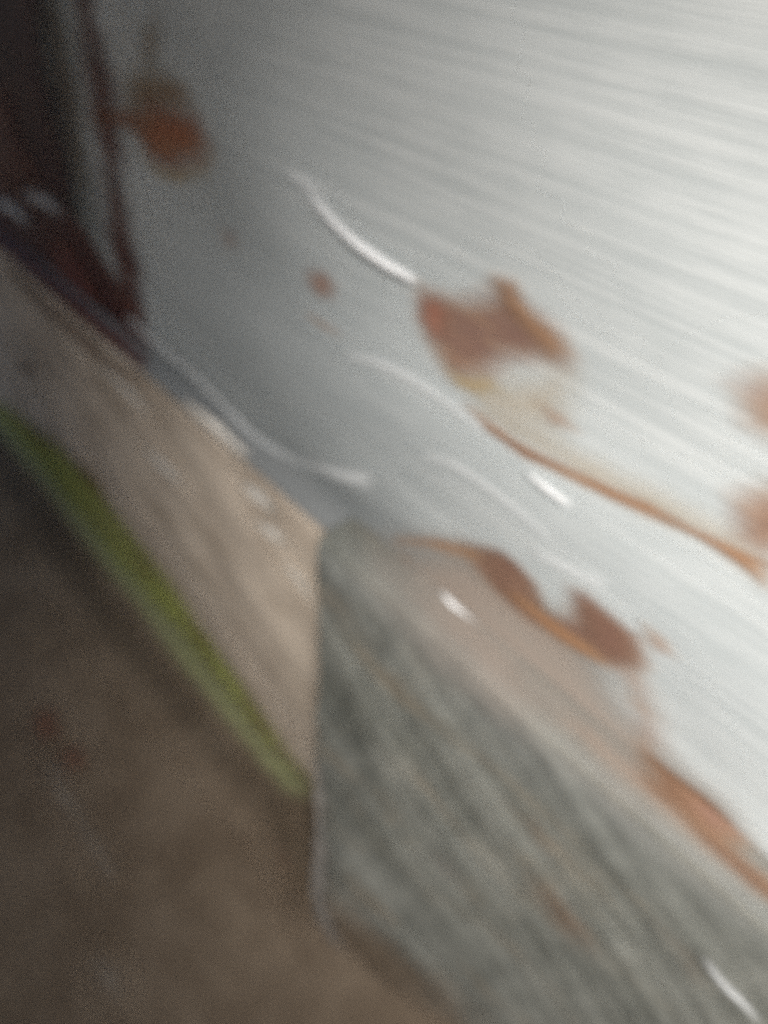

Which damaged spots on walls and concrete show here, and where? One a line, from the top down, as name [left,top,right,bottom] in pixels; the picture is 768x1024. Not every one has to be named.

corrosion [0,0,200,365]
corrosion [424,289,556,388]
corrosion [484,421,665,518]
corrosion [686,528,761,572]
corrosion [743,495,768,546]
corrosion [428,541,637,663]
corrosion [618,754,768,893]